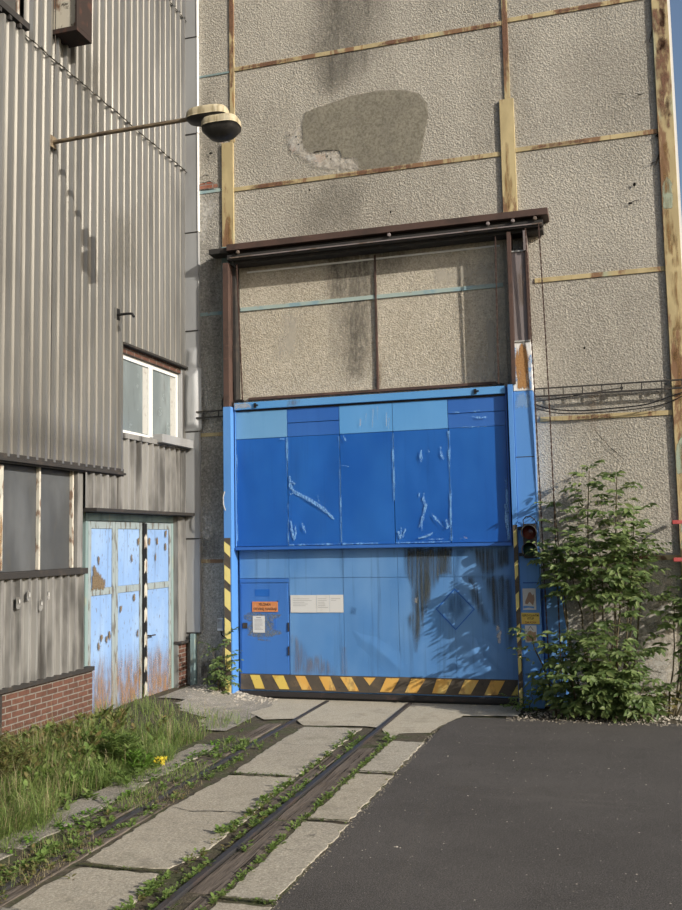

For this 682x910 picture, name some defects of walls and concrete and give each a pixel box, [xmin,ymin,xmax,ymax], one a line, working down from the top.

corrosion [652,0,671,127]
flaking render [288,130,358,169]
corrosion [515,344,529,389]